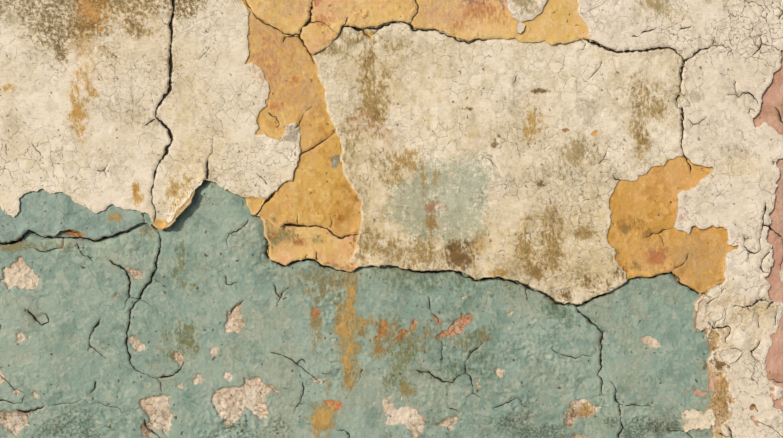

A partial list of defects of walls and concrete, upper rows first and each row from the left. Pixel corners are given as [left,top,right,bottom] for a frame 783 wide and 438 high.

crack [245,0,487,64]
peeling [0,0,595,272]
crack [579,28,731,177]
spalling [0,256,39,290]
crack [0,0,183,392]
rust [335,272,371,385]
crack [265,215,654,438]
peeling [313,0,783,438]
crack [629,253,777,361]
spalling [139,394,173,438]
spalling [211,371,280,425]
rust [312,402,335,429]